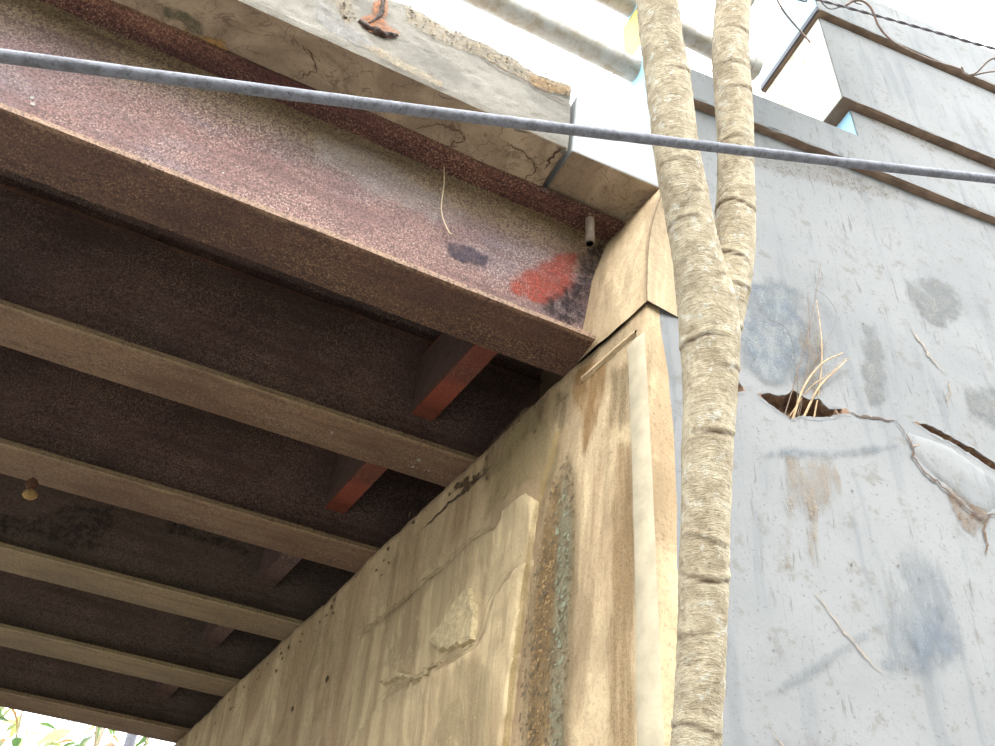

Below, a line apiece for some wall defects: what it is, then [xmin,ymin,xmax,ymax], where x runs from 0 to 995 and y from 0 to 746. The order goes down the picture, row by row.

corrosion [358,0,399,39]
corrosion [449,243,488,265]
corrosion [511,245,603,325]
spalling [738,379,747,396]
crack [757,385,995,552]
leakage [488,395,575,746]